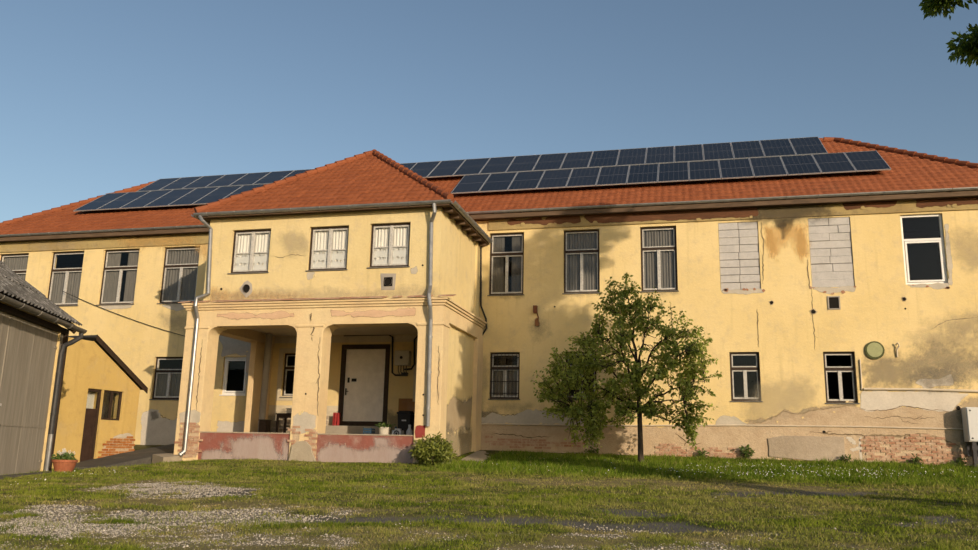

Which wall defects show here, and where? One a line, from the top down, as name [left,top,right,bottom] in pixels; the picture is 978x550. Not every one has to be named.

crack [807,260,816,349]
peeling [219,335,251,386]
damp [871,350,978,388]
peeling [98,409,203,458]
peeling [216,421,245,432]
peeling [268,410,318,456]
peeling [446,395,978,466]